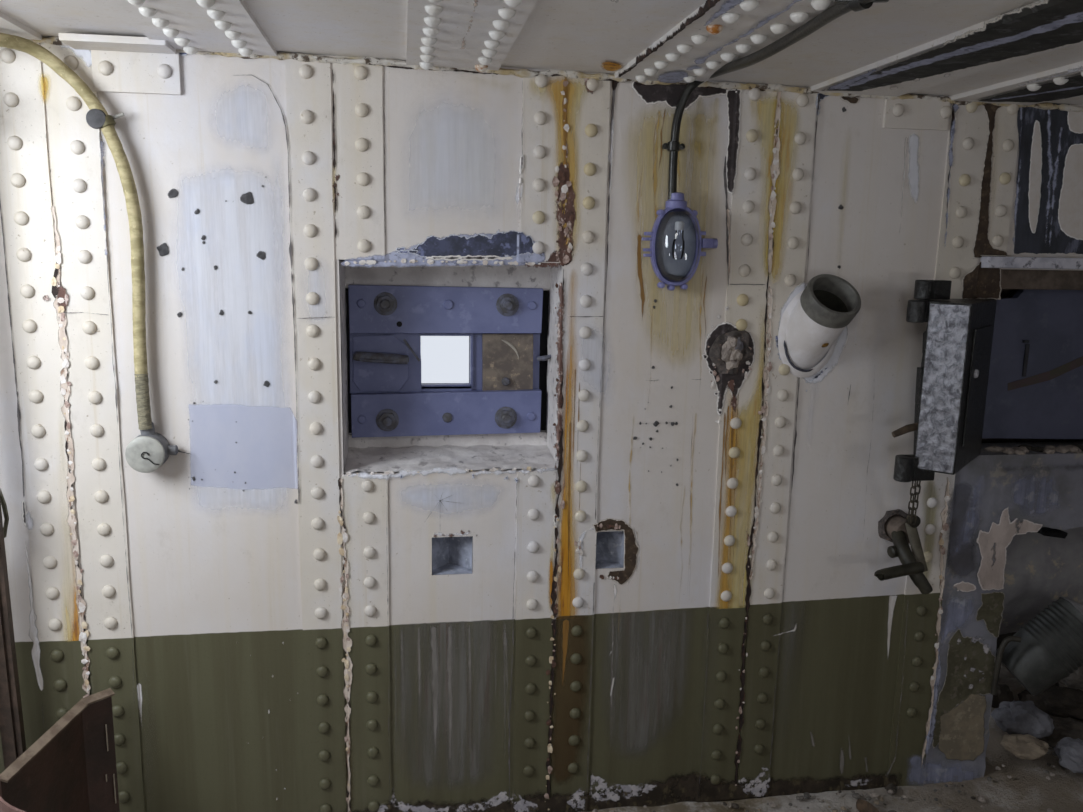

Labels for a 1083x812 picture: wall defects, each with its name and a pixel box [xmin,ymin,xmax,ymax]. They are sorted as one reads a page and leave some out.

peeling [341,230,545,267]
corrosion [525,80,582,268]
peeling [961,68,1083,300]
crack [43,132,133,698]
corrosion [550,283,587,782]
crack [370,0,801,812]
peeling [693,306,755,423]
corrosion [718,393,760,609]
crack [337,478,353,812]
leakage [377,792,538,812]
leakage [567,775,656,812]
leakage [740,767,770,797]